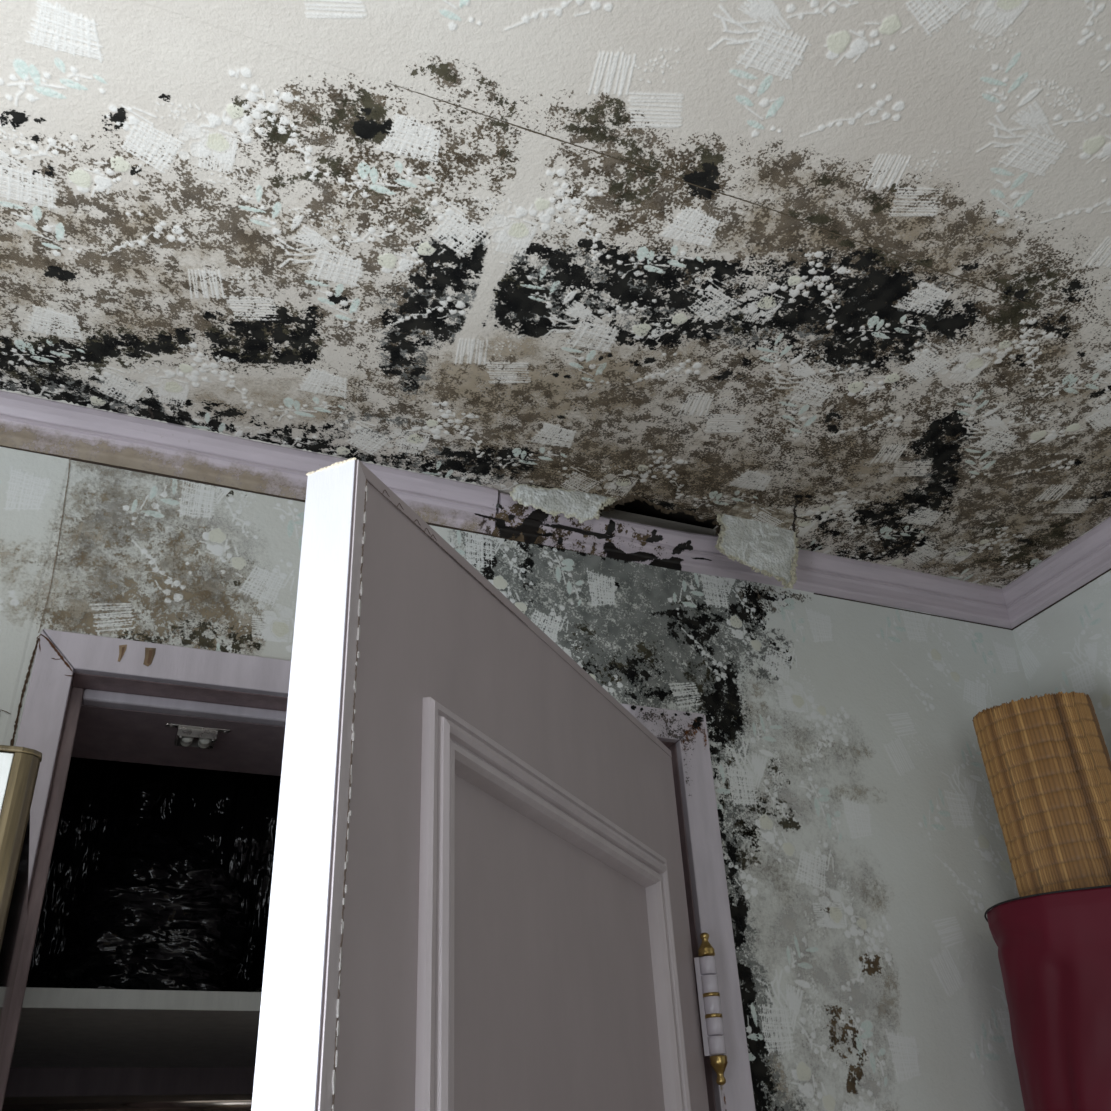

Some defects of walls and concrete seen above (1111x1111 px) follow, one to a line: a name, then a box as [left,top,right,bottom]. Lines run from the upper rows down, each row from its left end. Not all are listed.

water stain [0,425,306,653]
water stain [0,56,1111,588]
water stain [415,501,811,1111]
water stain [772,895,897,1096]